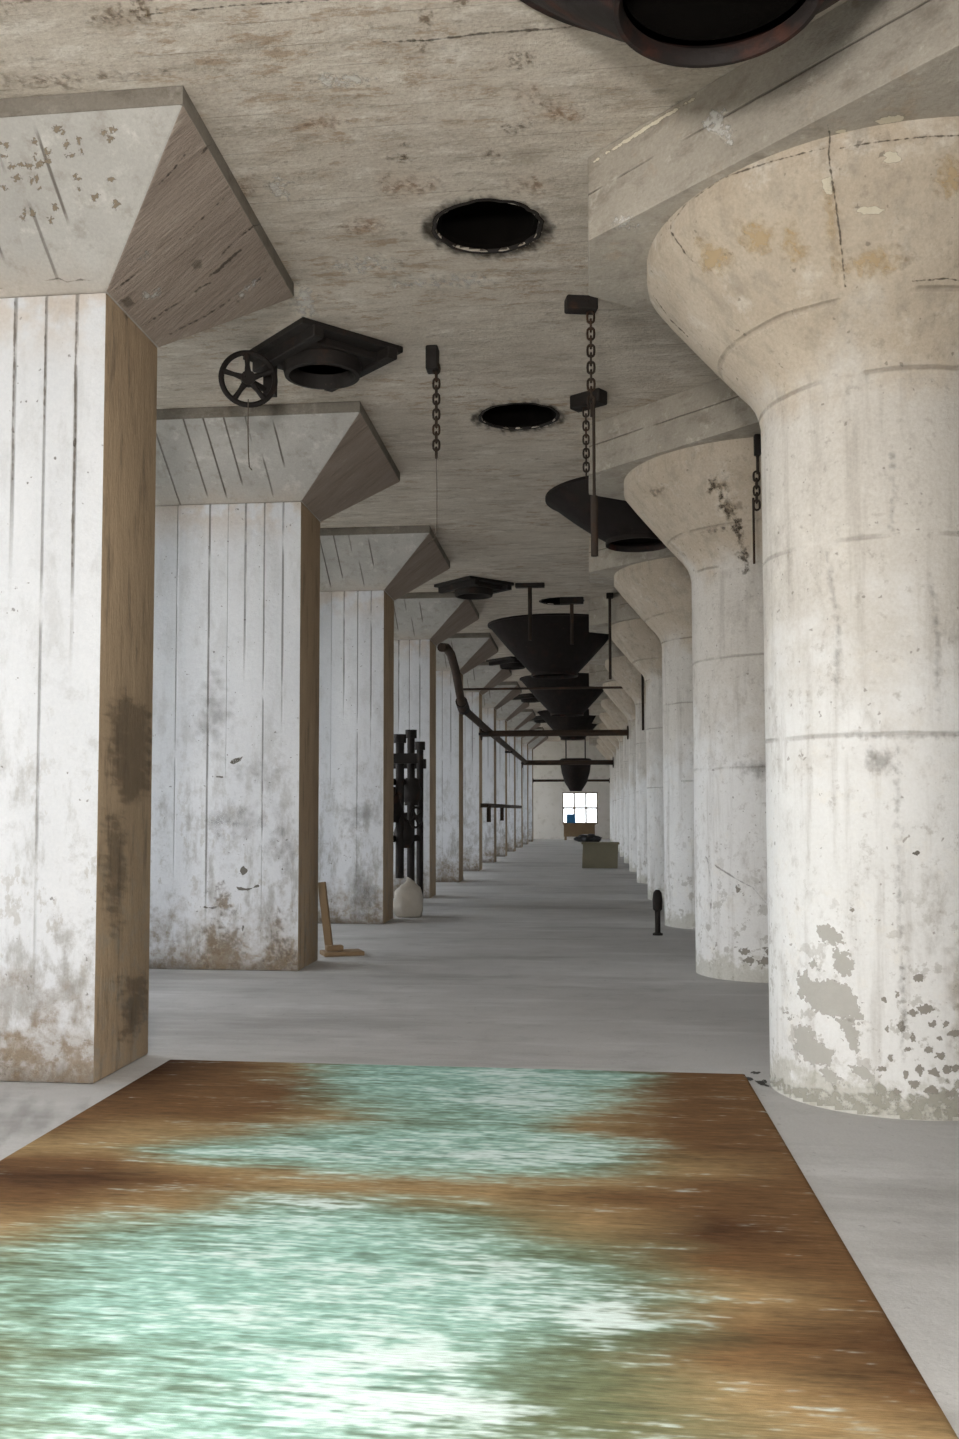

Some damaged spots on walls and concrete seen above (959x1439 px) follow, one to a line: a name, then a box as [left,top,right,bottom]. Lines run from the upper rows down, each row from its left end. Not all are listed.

peeling [739,947,768,966]
peeling [783,923,959,1097]